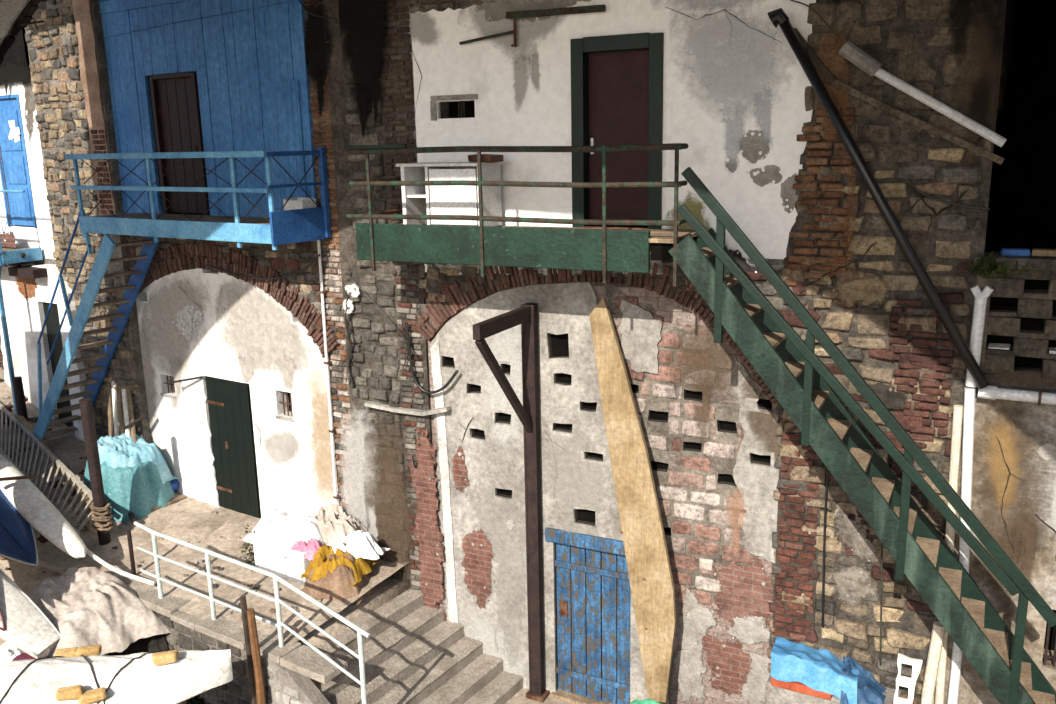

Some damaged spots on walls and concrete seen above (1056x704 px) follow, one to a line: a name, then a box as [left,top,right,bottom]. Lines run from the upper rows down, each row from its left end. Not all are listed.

crack [666,7,782,43]
leakage [676,0,776,164]
flaking render [0,230,17,249]
spalling [4,263,37,299]
flaking render [404,423,445,621]
flaking render [451,446,469,493]
crack [996,437,1026,553]
flaking render [461,527,495,609]
flaking render [697,556,774,696]